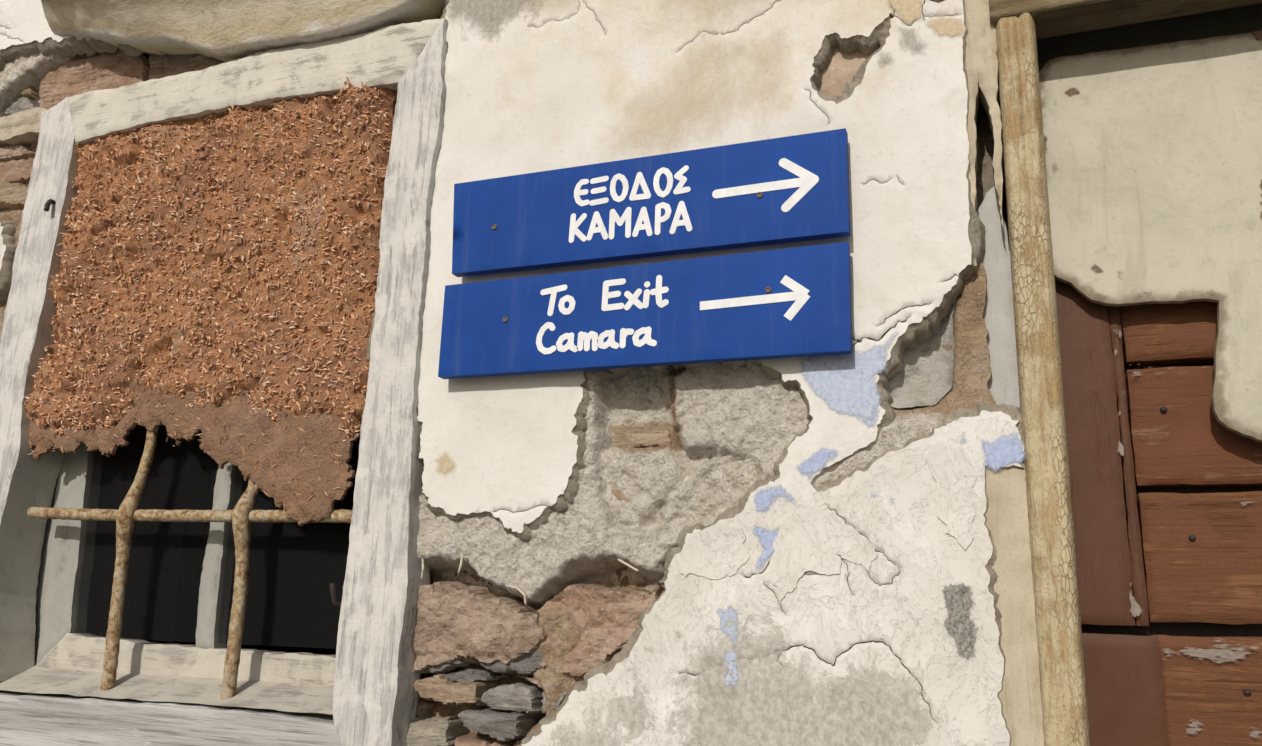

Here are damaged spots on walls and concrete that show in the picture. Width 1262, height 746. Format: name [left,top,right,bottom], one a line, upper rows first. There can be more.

crack [891,0,957,26]
flaking render [818,47,871,97]
flaking render [0,48,225,246]
flaking render [814,263,996,488]
flaking render [406,362,811,746]
crack [744,561,785,613]
peeling [752,506,878,601]
crack [830,509,900,589]
flaking render [942,584,977,659]
peeling [1129,583,1142,617]
peeling [670,609,930,746]
crack [750,640,933,719]